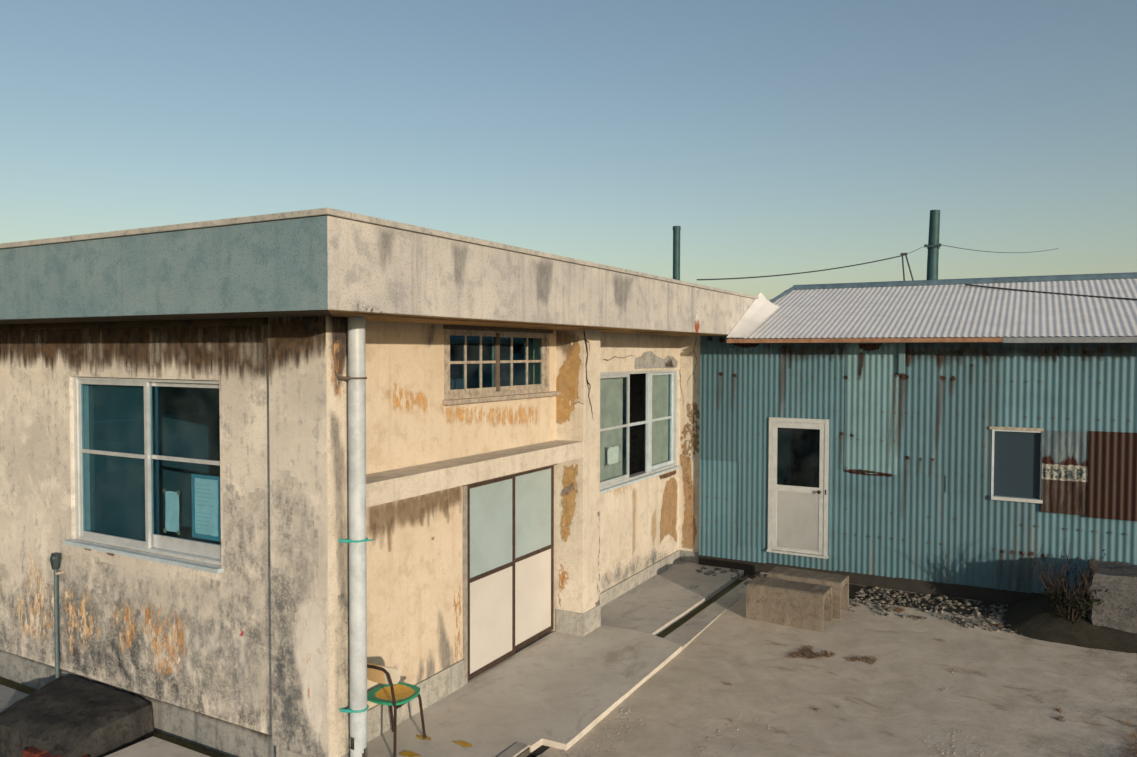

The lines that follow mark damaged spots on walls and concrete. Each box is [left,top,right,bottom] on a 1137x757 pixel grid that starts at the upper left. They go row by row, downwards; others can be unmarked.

leakage [0,306,382,394]
flaking render [357,313,593,424]
crack [574,330,633,415]
rust [695,314,759,348]
rust [844,343,882,379]
leakage [331,416,345,605]
flaking render [560,464,578,542]
flaking render [659,402,700,549]
rust [844,469,892,477]
peeling [13,552,186,675]
leakage [0,576,270,737]
leakage [277,650,309,751]